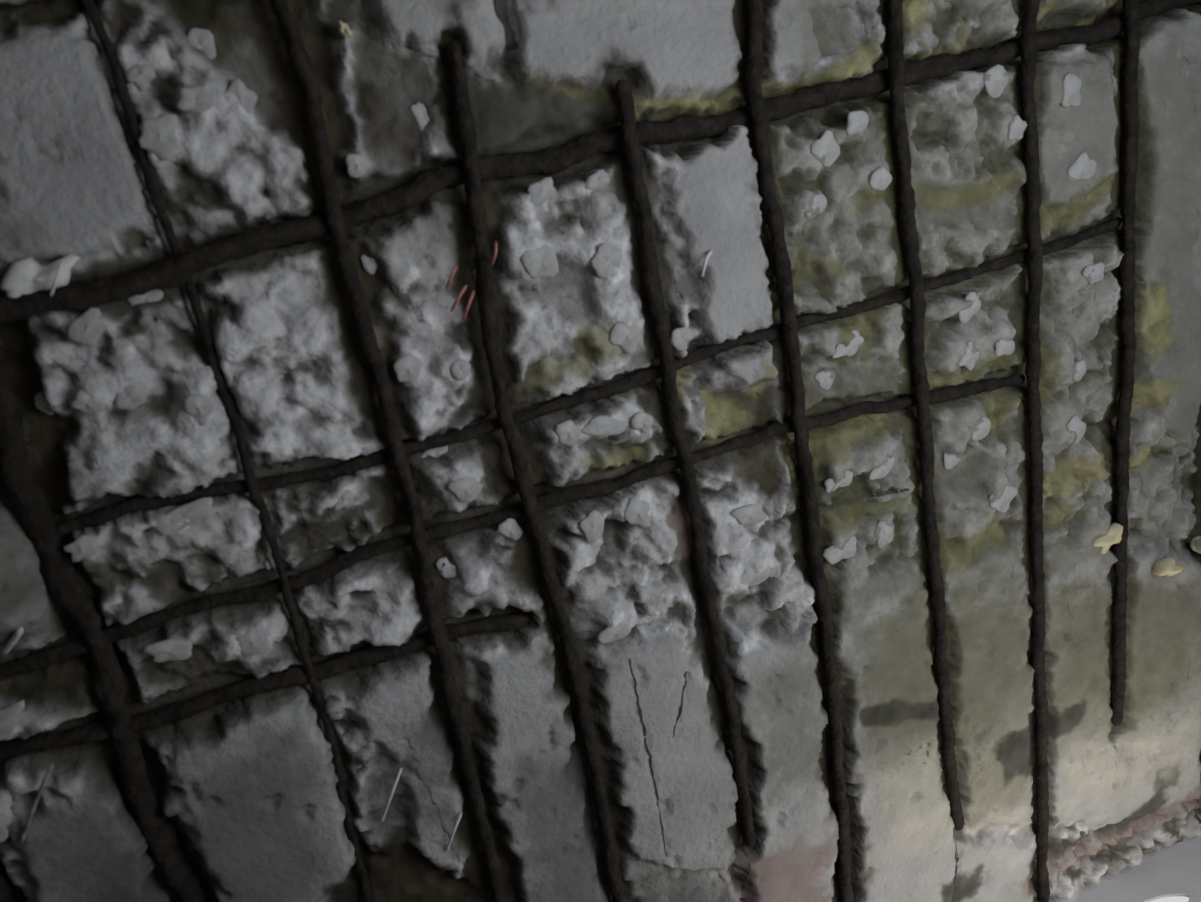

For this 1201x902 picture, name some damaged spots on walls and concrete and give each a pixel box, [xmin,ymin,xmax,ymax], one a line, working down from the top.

spalling [0,0,546,902]
corrosion [325,833,494,902]
crack [494,0,518,52]
spalling [445,0,1201,902]